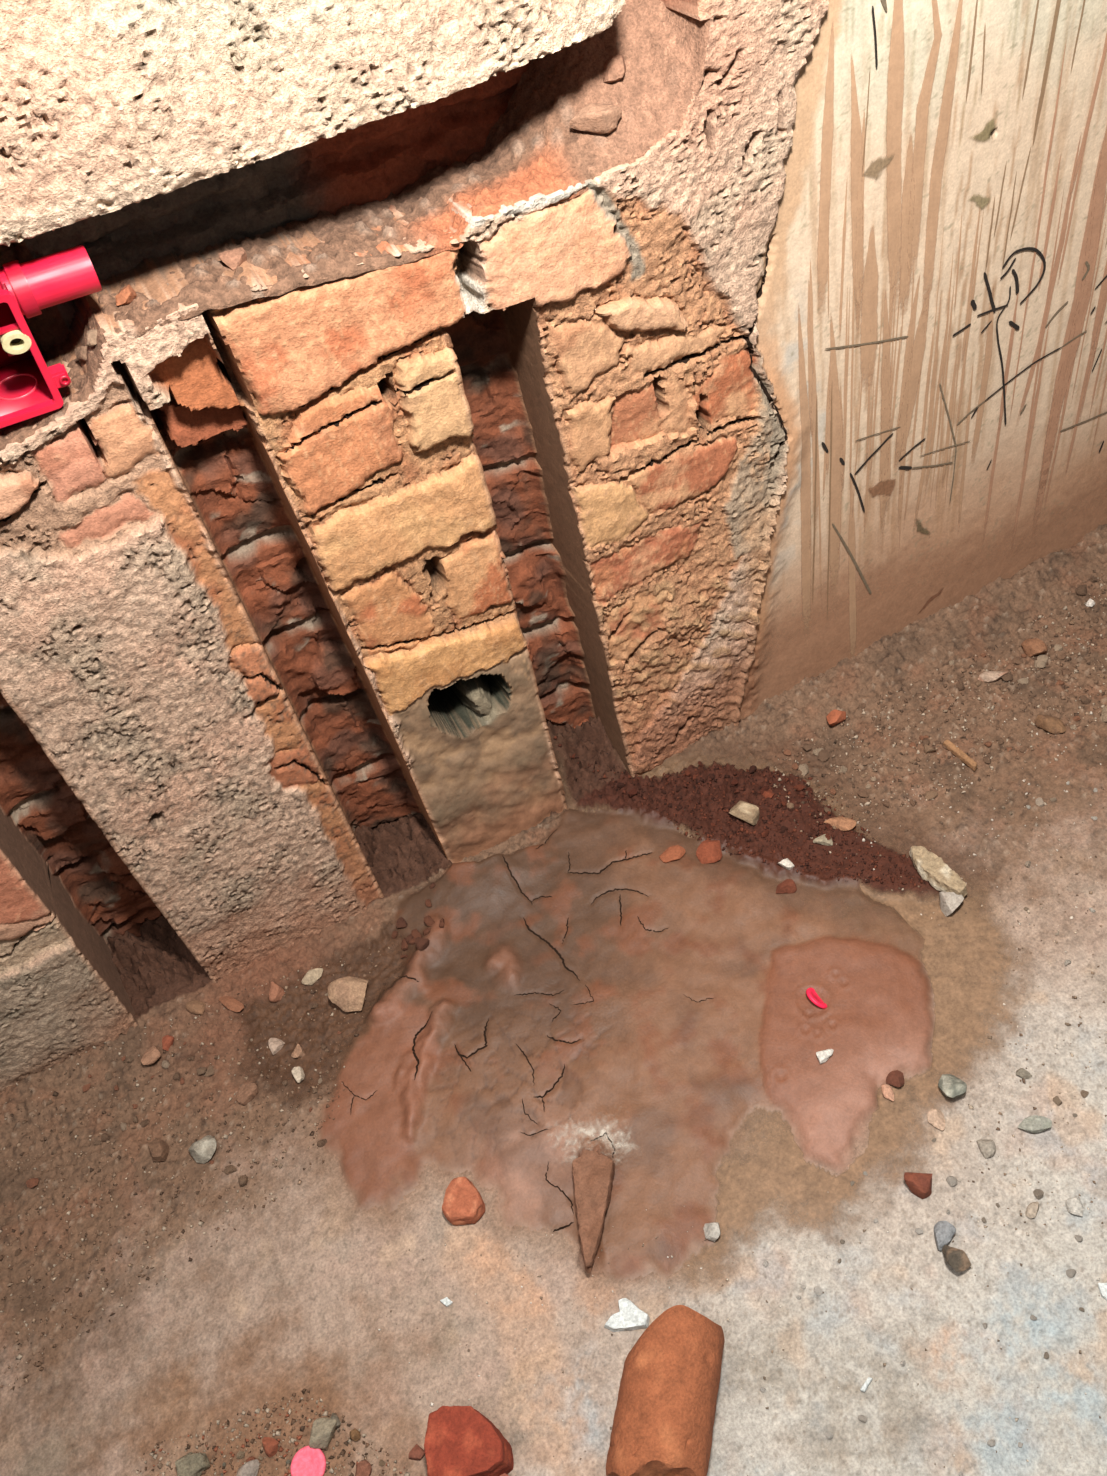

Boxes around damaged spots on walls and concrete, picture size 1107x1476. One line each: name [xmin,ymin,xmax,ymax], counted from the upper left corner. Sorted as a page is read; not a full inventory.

water stain [862,72,870,173]
water stain [966,0,986,101]
water stain [985,0,1061,272]
water stain [1071,0,1085,71]
spalling [148,184,789,774]
water stain [812,392,832,617]
spalling [0,382,384,909]
spalling [0,848,74,977]